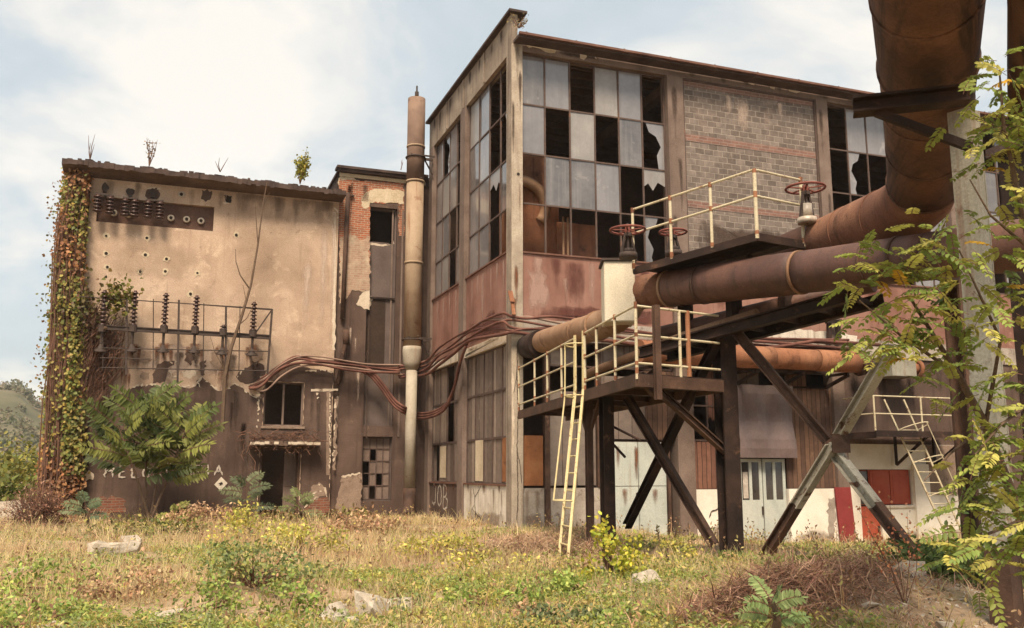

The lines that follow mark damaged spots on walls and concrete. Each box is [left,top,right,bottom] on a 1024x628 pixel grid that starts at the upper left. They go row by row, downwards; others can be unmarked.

flaking render [332,176,405,350]
water stain [529,258,548,306]
rust [554,259,582,292]
rust [554,307,598,320]
flaking render [79,349,363,521]